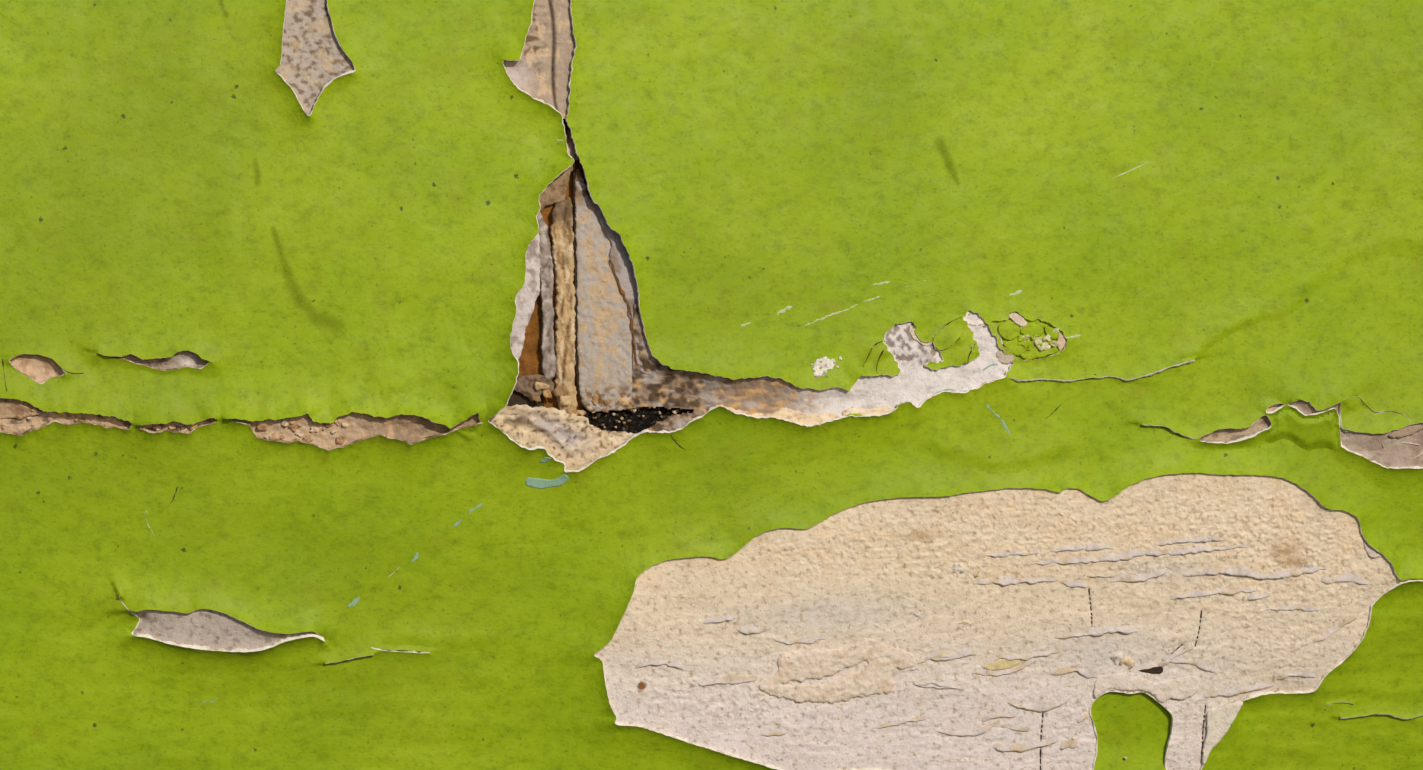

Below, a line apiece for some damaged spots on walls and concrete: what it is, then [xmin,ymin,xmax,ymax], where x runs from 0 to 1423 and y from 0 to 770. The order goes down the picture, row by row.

peeling [276,0,355,116]
peeling [503,0,577,119]
peeling [9,354,83,384]
peeling [97,350,211,371]
flaking render [488,160,1195,489]
peeling [1281,399,1423,469]
peeling [118,595,325,652]
peeling [594,473,1423,770]